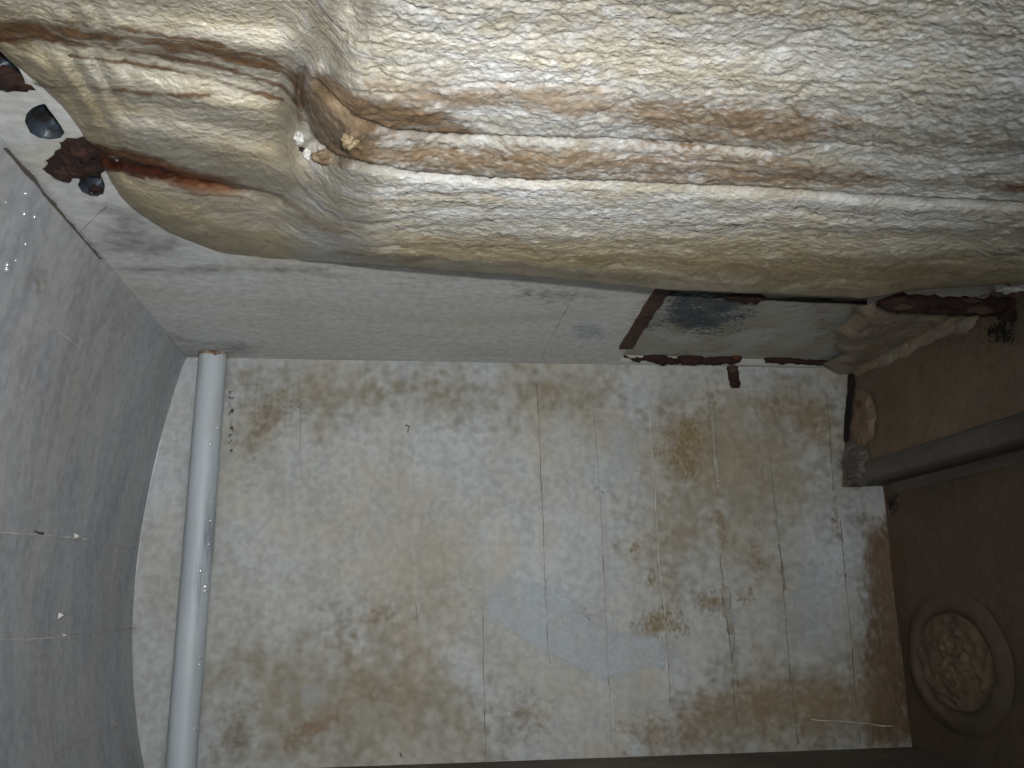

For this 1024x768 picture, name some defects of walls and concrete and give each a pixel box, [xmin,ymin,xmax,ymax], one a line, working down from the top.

corrosion [0,65,36,92]
water stain [0,21,882,188]
corrosion [43,136,247,194]
corrosion [619,289,742,366]
water stain [646,292,756,334]
corrosion [876,292,1018,322]
corrosion [764,357,828,366]
crack [536,382,550,662]
water stain [718,494,911,749]